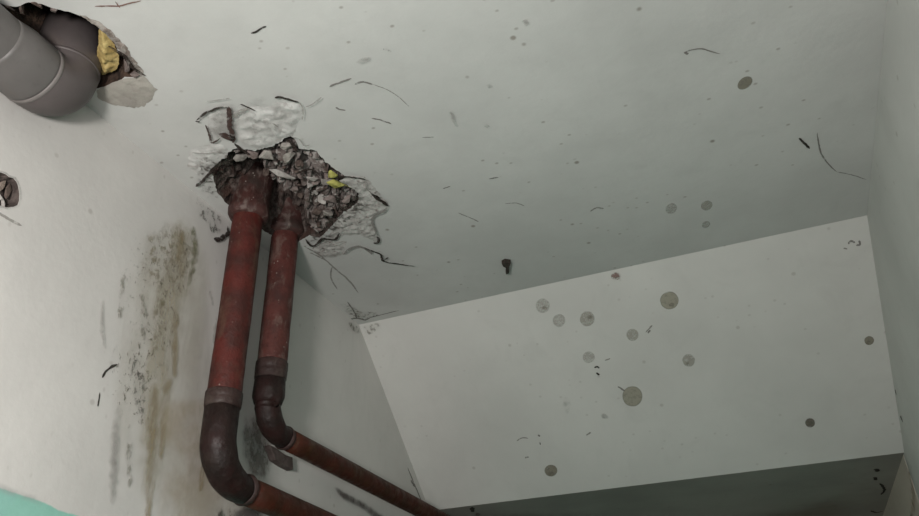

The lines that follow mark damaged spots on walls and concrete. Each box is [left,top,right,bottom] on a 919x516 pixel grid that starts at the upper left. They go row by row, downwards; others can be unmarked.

spalling [1,2,58,33]
flaking render [80,15,158,108]
spalling [0,173,22,226]
flaking render [187,96,411,266]
damp [119,296,164,456]